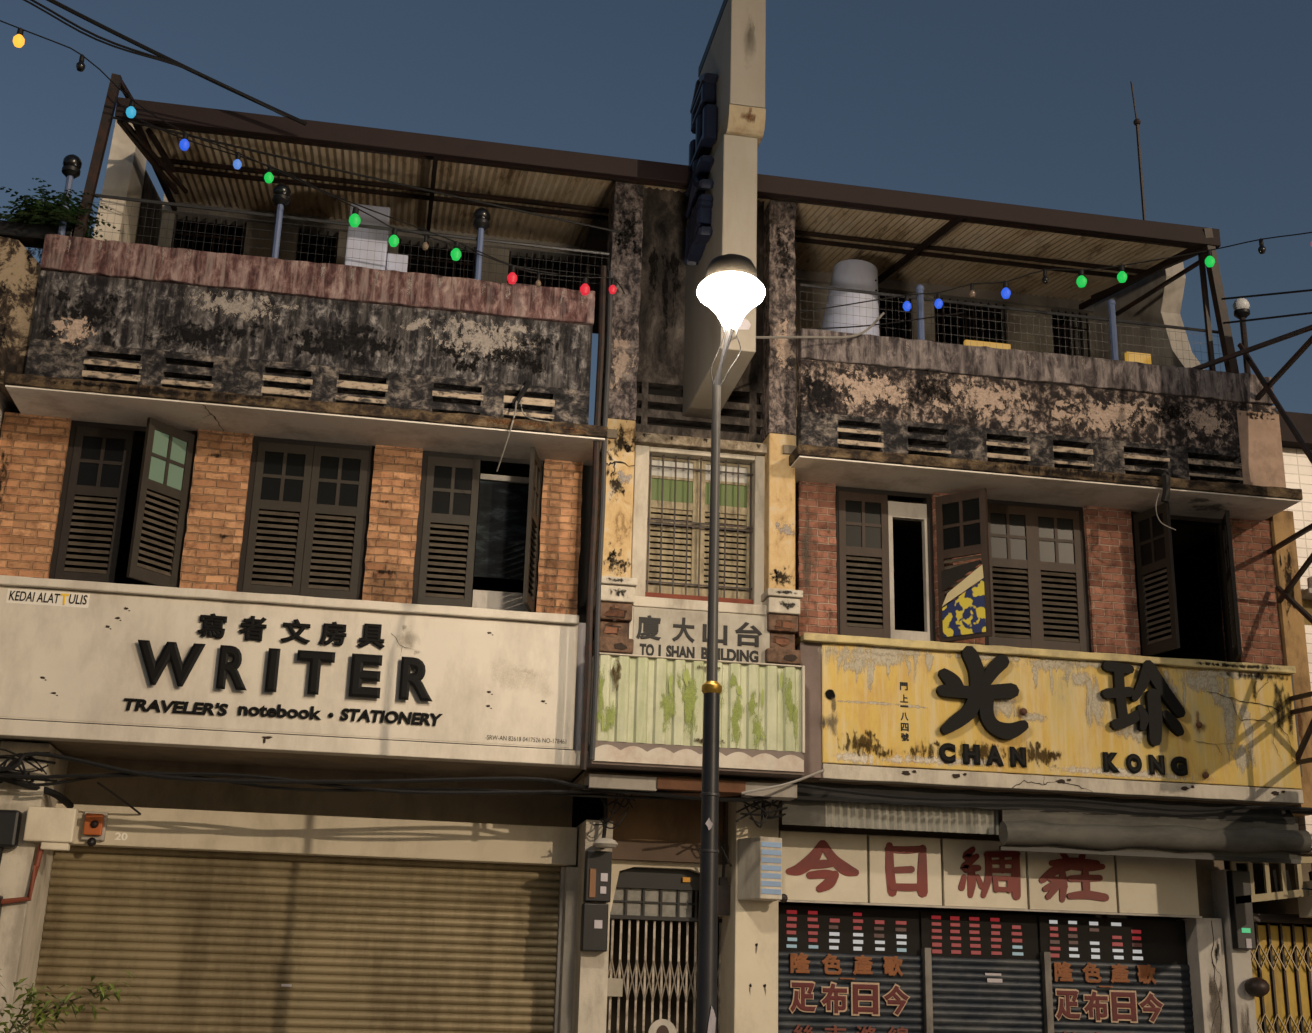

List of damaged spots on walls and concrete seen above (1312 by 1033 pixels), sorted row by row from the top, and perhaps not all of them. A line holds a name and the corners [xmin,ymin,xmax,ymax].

water stain [41,288,131,347]
water stain [145,321,404,365]
water stain [439,328,561,375]
water stain [606,421,649,500]
water stain [603,542,630,596]
water stain [770,518,814,609]
peeling [661,668,697,734]
peeling [720,674,766,746]
peeling [978,653,1106,726]
crack [1196,674,1293,758]
peeling [837,752,1004,778]
peeling [1057,766,1195,791]